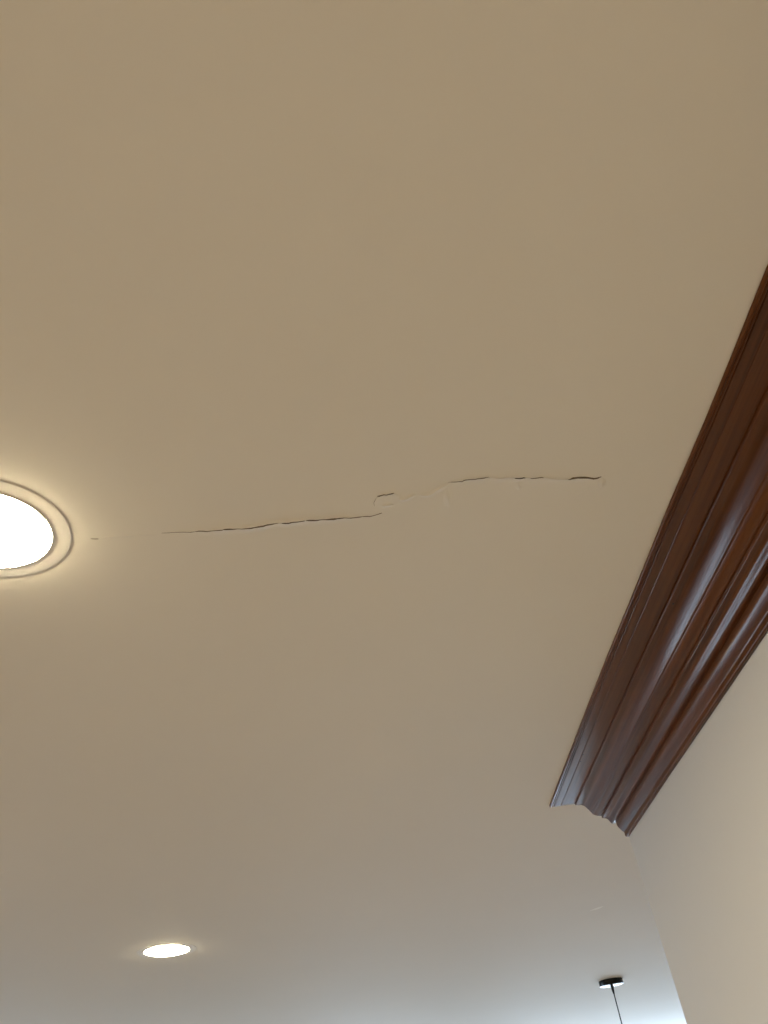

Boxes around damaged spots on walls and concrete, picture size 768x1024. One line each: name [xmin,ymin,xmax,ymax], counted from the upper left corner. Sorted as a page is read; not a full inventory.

crack [448,473,601,487]
crack [91,512,383,539]